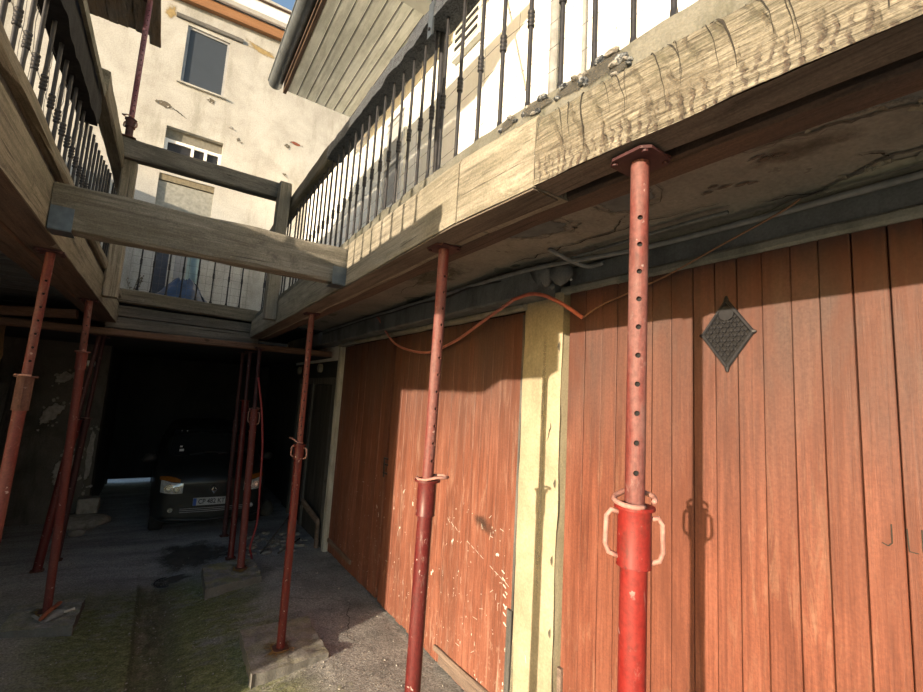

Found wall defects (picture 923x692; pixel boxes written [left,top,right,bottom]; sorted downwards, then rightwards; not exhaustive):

crack [764,146,923,213]
peeling [593,193,630,216]
peeling [37,397,70,431]
damp [157,541,228,586]